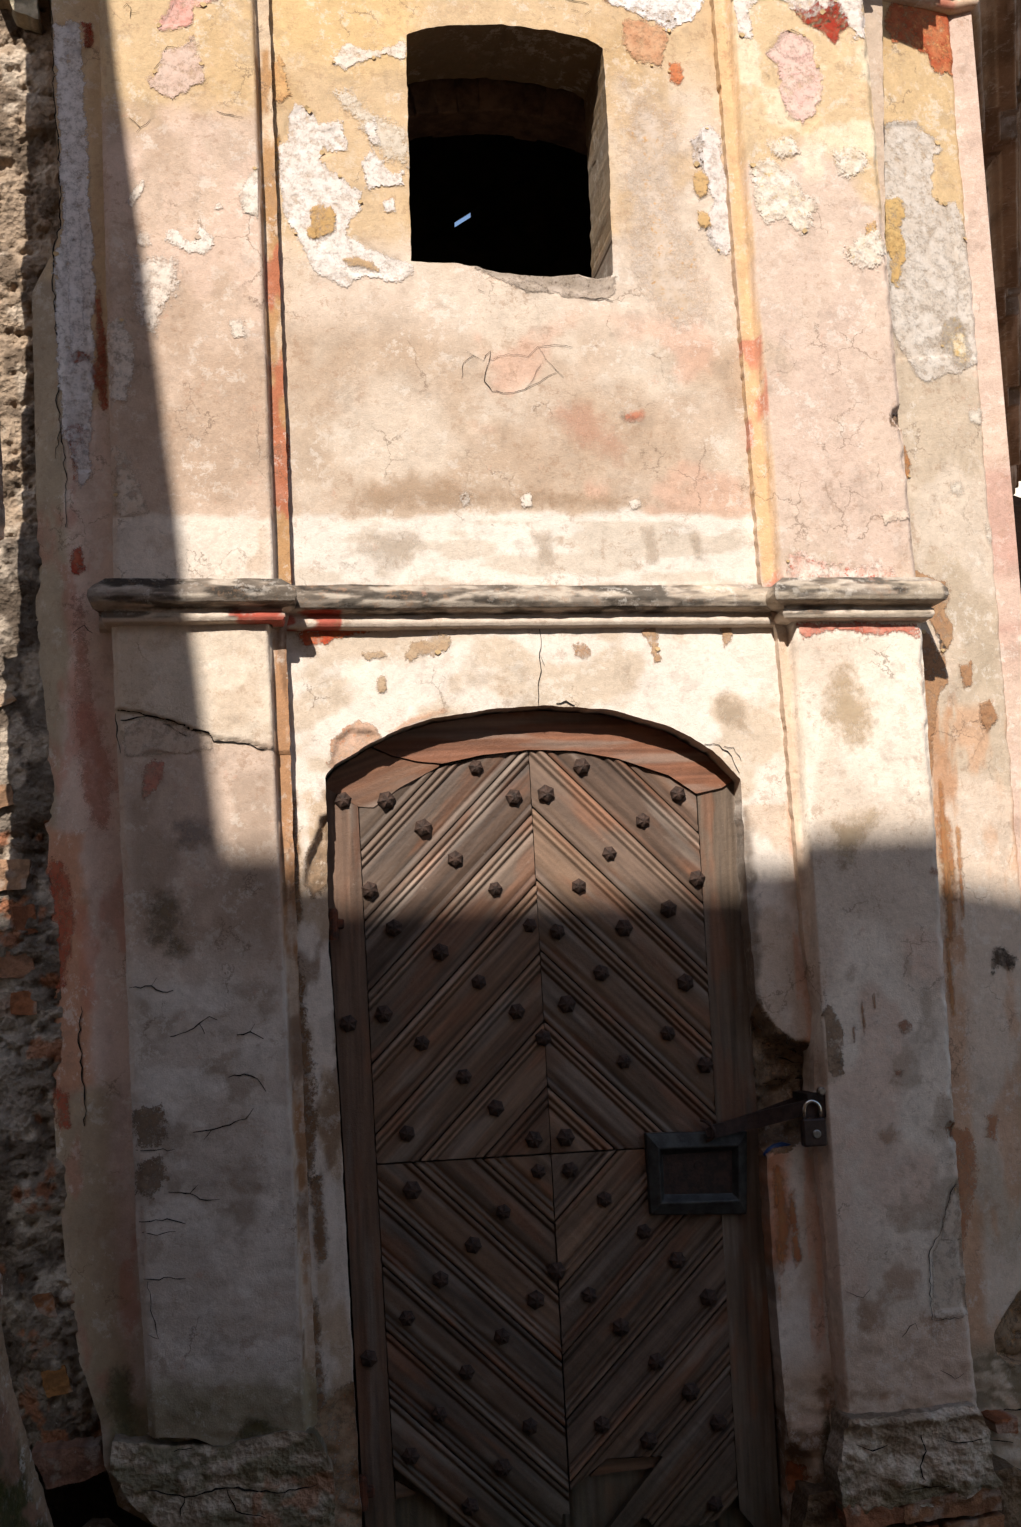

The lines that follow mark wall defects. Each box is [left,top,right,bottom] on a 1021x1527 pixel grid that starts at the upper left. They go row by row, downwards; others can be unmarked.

peeling [238,41,414,288]
peeling [604,0,704,84]
peeling [733,0,758,39]
peeling [749,0,866,235]
peeling [832,120,978,382]
peeling [889,404,912,478]
flaking render [0,0,216,1527]
crack [115,710,268,753]
peeling [785,550,973,776]
peeling [979,699,998,729]
flaking render [750,994,845,1155]
flaking render [994,1290,1021,1367]